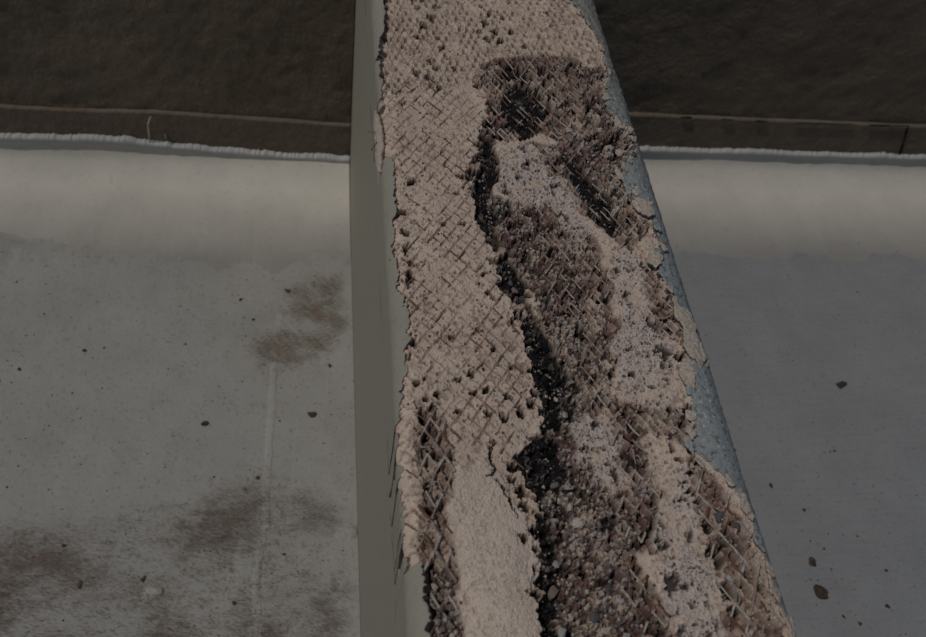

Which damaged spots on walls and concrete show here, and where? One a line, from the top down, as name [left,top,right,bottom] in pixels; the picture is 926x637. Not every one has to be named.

spalling [367,0,796,637]